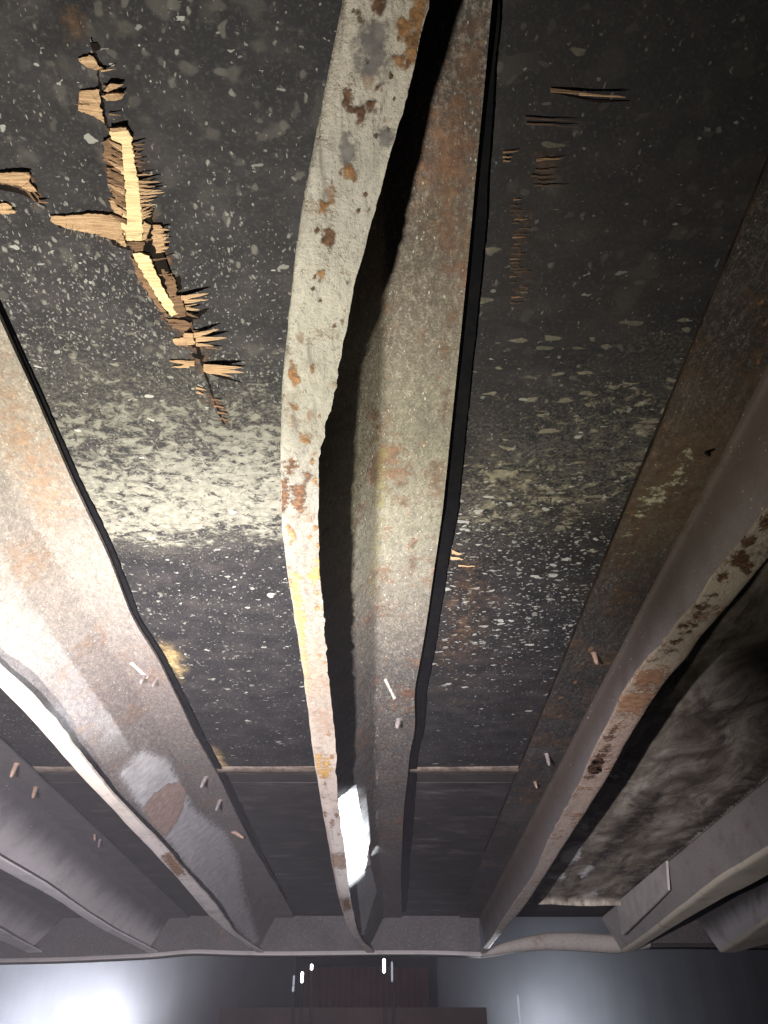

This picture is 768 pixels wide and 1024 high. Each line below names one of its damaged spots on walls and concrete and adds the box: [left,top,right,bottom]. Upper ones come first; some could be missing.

rust [342,0,429,125]
crack [0,38,244,428]
rust [314,228,335,248]
rust [331,165,357,184]
rust [288,361,300,387]
rust [667,513,768,652]
damp [629,767,767,887]